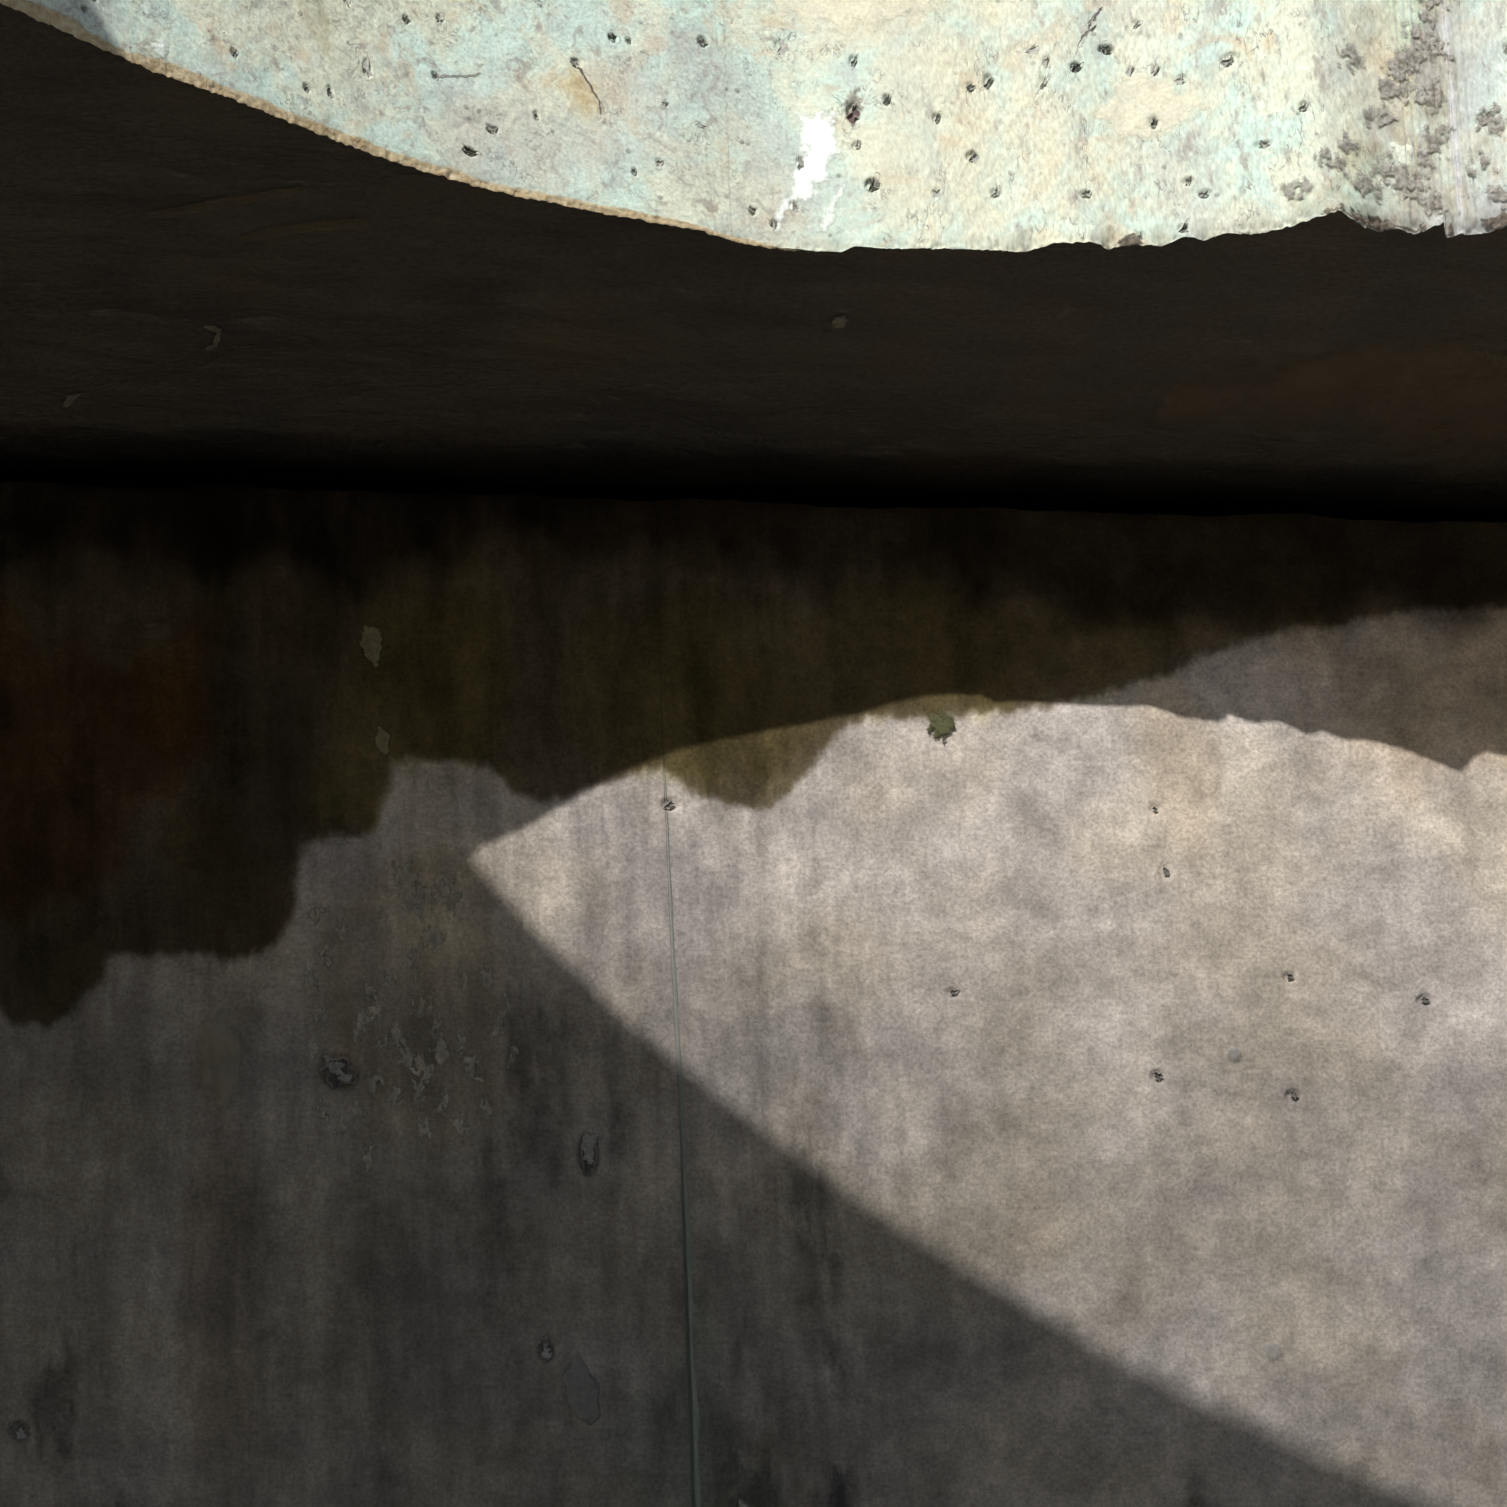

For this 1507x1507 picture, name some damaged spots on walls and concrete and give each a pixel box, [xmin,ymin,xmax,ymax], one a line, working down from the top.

leakage [0,469,1507,1024]